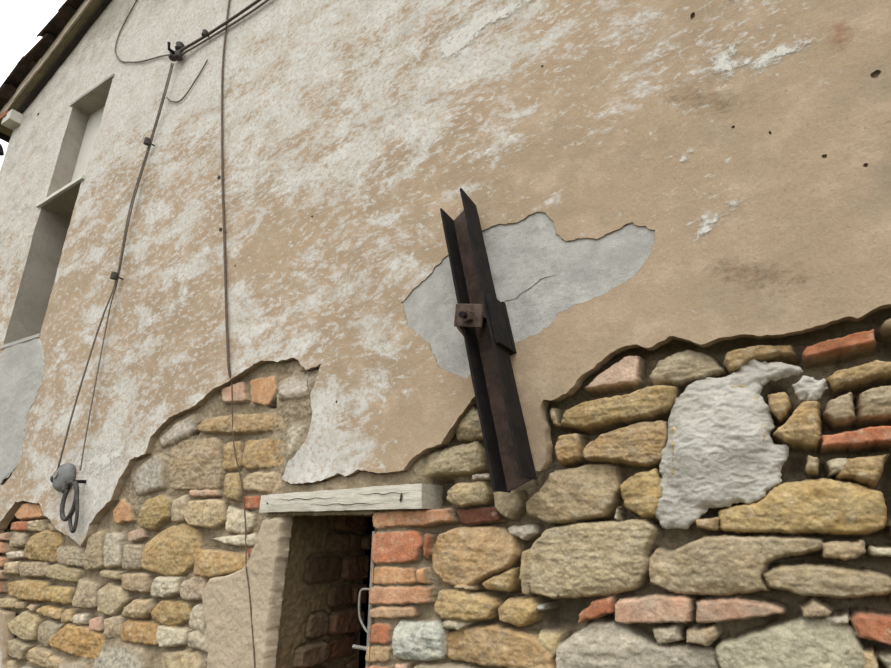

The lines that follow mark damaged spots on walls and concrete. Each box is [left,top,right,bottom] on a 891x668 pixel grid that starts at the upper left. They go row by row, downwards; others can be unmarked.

flaking render [401,255,471,379]
flaking render [482,211,655,343]
spalling [0,304,891,668]